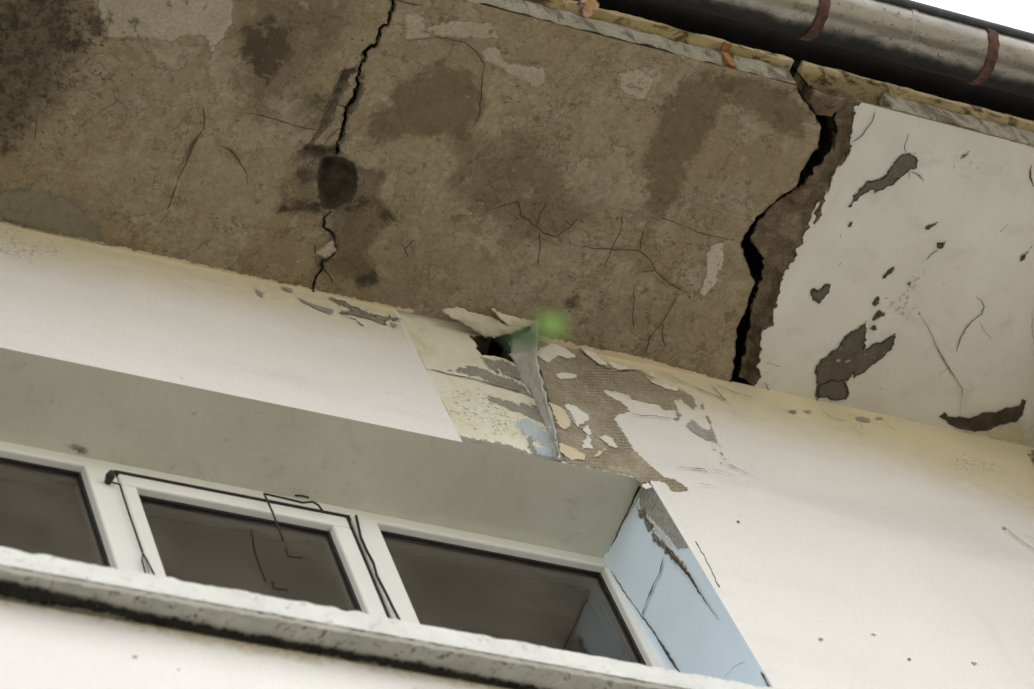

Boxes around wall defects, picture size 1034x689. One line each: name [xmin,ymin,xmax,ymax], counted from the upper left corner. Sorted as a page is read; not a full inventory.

mould [0,0,140,156]
crack [239,0,485,177]
crack [282,205,338,292]
crack [488,66,875,415]
peeling [849,134,924,208]
peeling [442,306,726,577]
peeling [788,297,896,413]
peeling [939,399,1026,432]